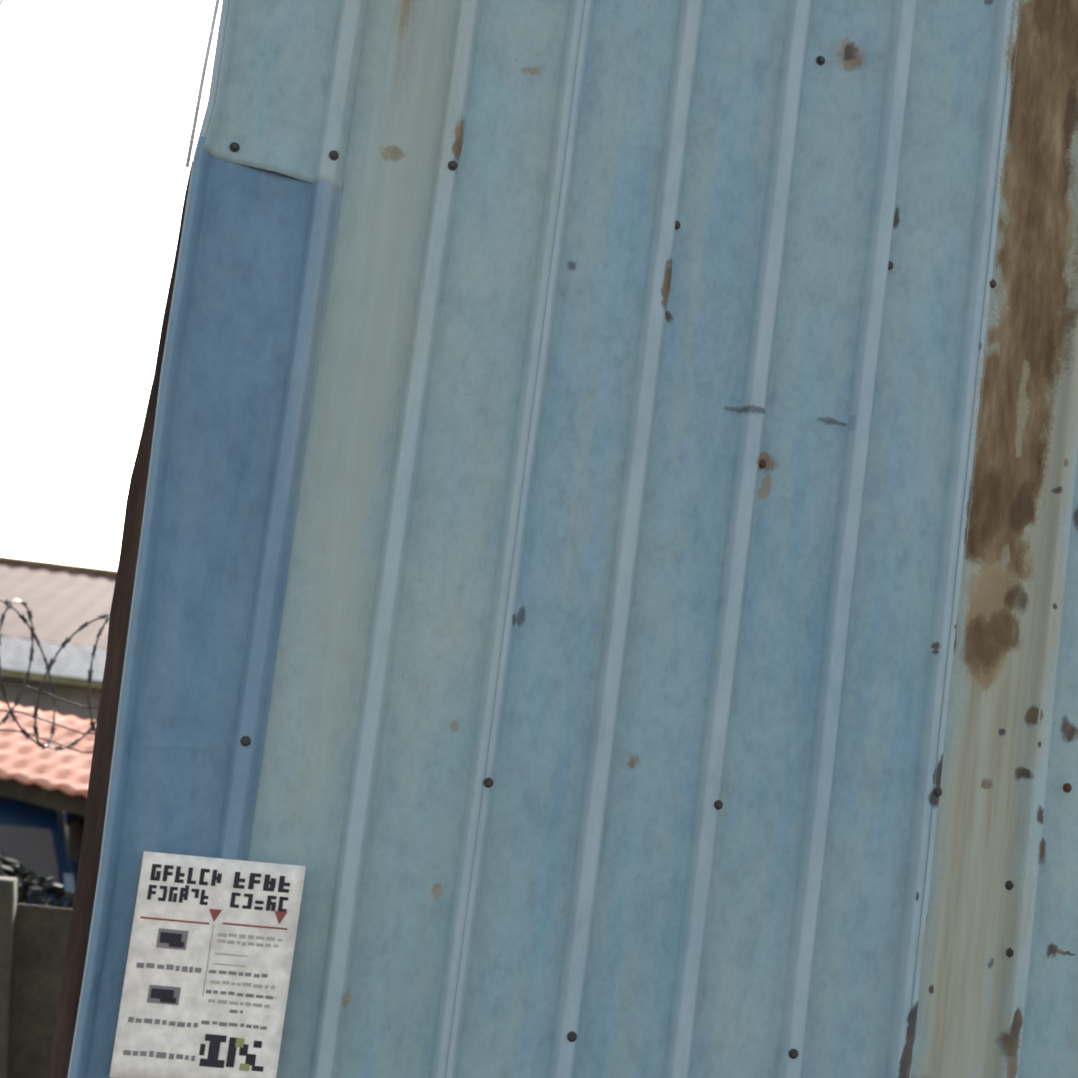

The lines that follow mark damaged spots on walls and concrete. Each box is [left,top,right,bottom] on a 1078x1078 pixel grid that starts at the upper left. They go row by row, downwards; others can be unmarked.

corrosion [837,41,864,71]
corrosion [452,121,464,162]
corrosion [661,259,673,322]
corrosion [954,0,1078,690]
corrosion [1025,706,1043,725]
corrosion [1061,717,1078,742]
corrosion [1015,767,1033,780]
corrosion [1047,943,1058,957]
corrosion [898,1002,918,1078]
corrosion [997,1009,1023,1078]